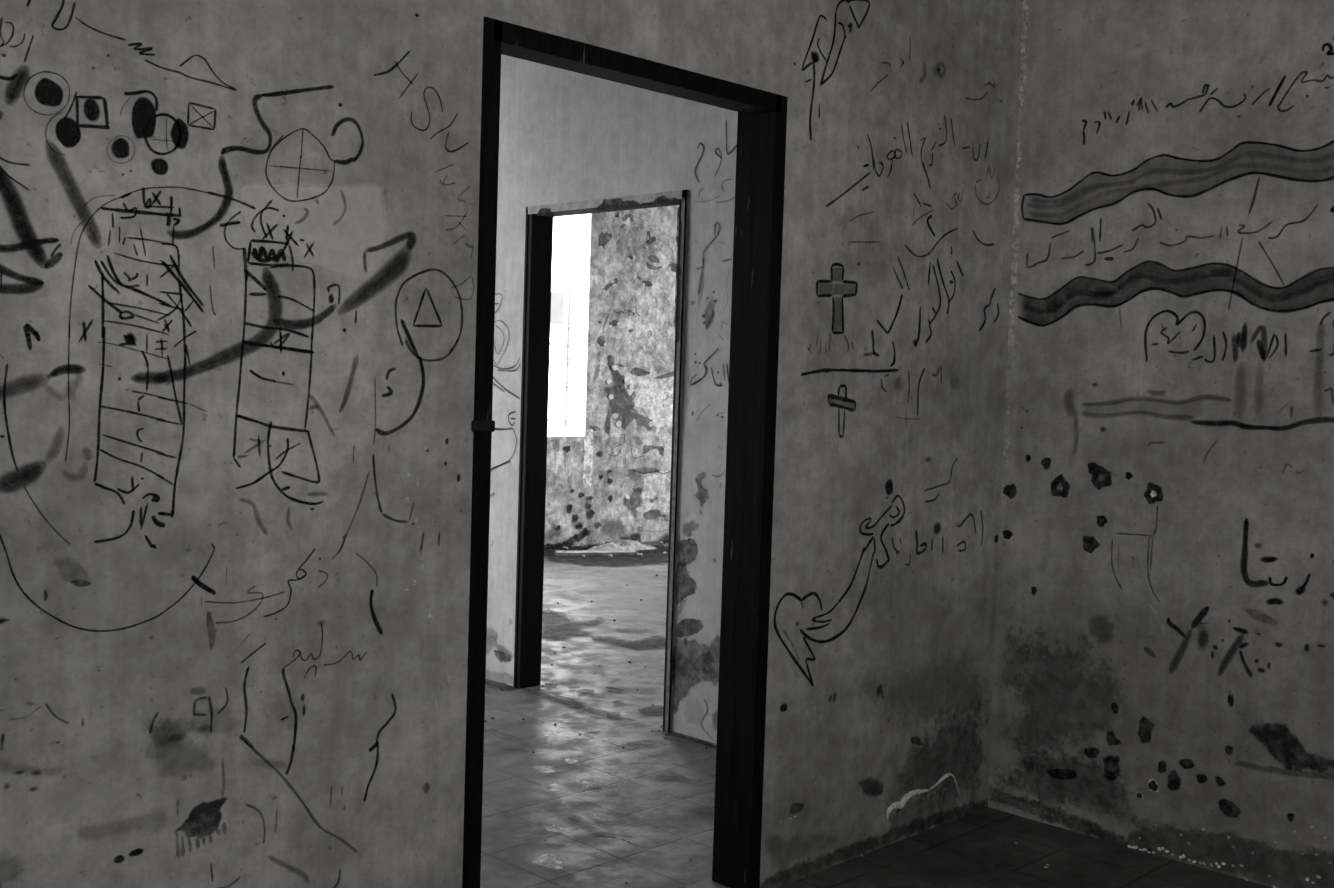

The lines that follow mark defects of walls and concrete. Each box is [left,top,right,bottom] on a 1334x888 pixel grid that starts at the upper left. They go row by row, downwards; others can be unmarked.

water stain [625,430,672,522]
water stain [696,473,708,505]
water stain [544,526,668,567]
peeling [675,538,699,604]
peeling [676,618,703,638]